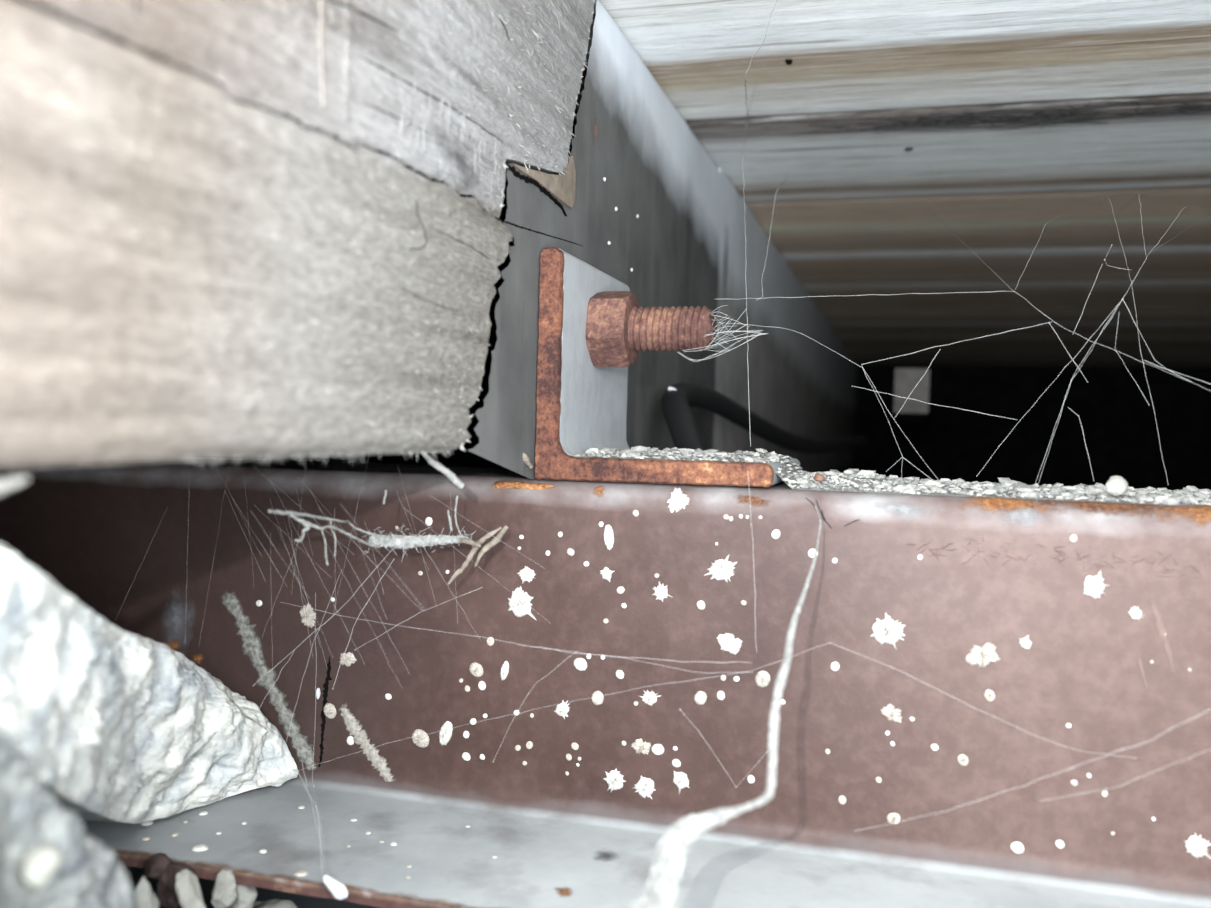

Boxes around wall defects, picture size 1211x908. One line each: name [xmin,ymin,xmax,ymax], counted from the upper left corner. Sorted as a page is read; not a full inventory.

crack [19,0,582,260]
leakage [1010,510,1035,521]
corrosion [971,496,1211,524]